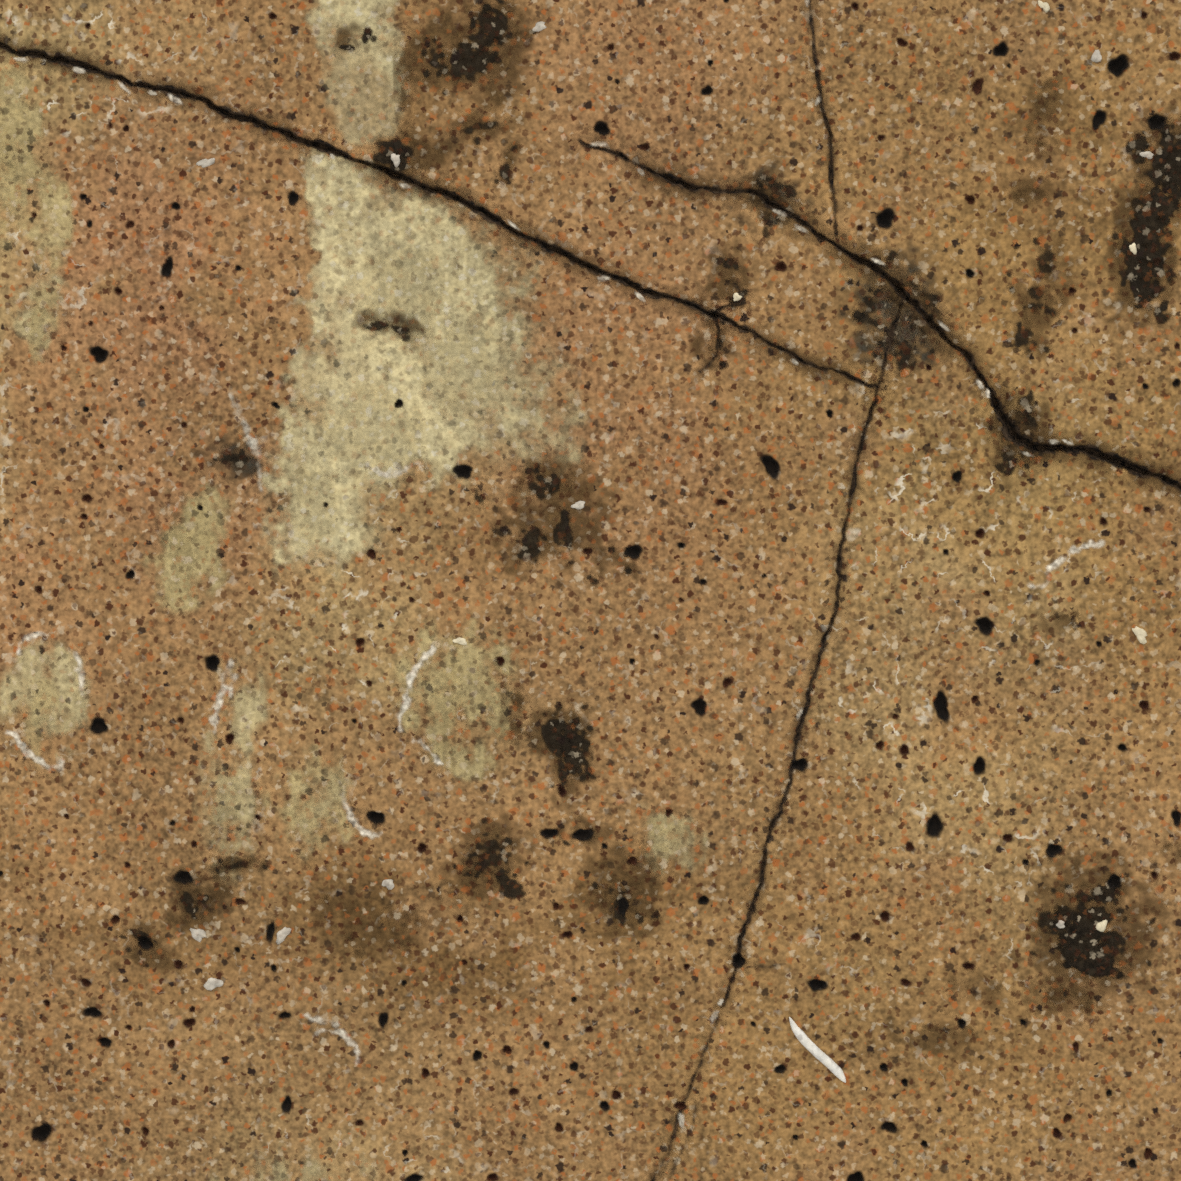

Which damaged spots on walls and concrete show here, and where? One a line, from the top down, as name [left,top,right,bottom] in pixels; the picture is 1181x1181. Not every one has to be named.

crack [0,0,1181,502]
crack [719,515,848,1004]
crack [669,1016,717,1173]